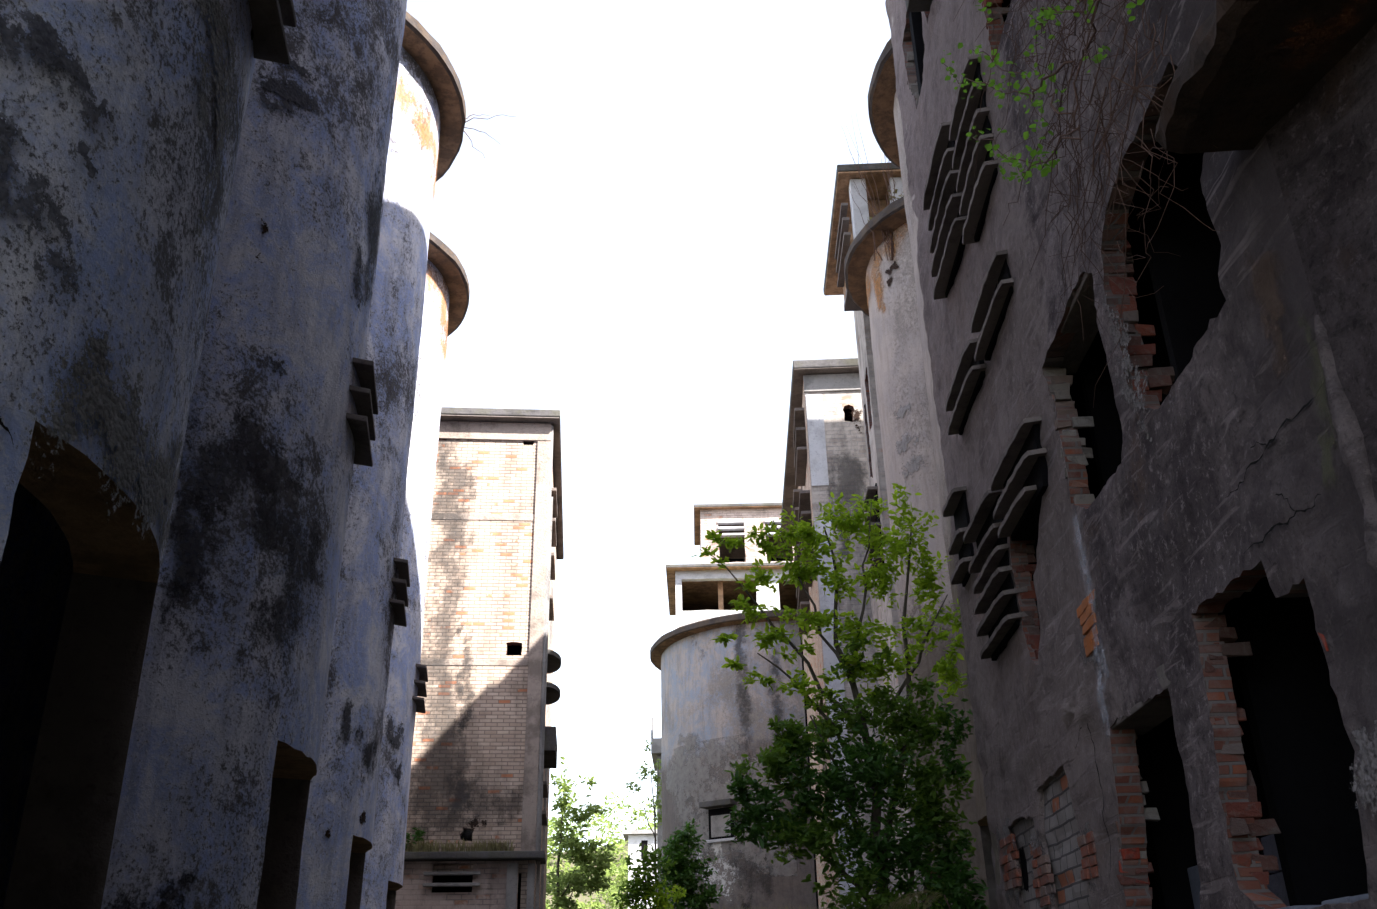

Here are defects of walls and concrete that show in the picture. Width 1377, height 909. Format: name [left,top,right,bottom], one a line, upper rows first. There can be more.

flaking render [1103,294,1152,443]
crack [1227,379,1325,497]
water stain [160,409,323,659]
crack [1244,493,1321,553]
water stain [411,442,521,833]
flaking render [1077,589,1100,664]
flaking render [996,818,1056,909]